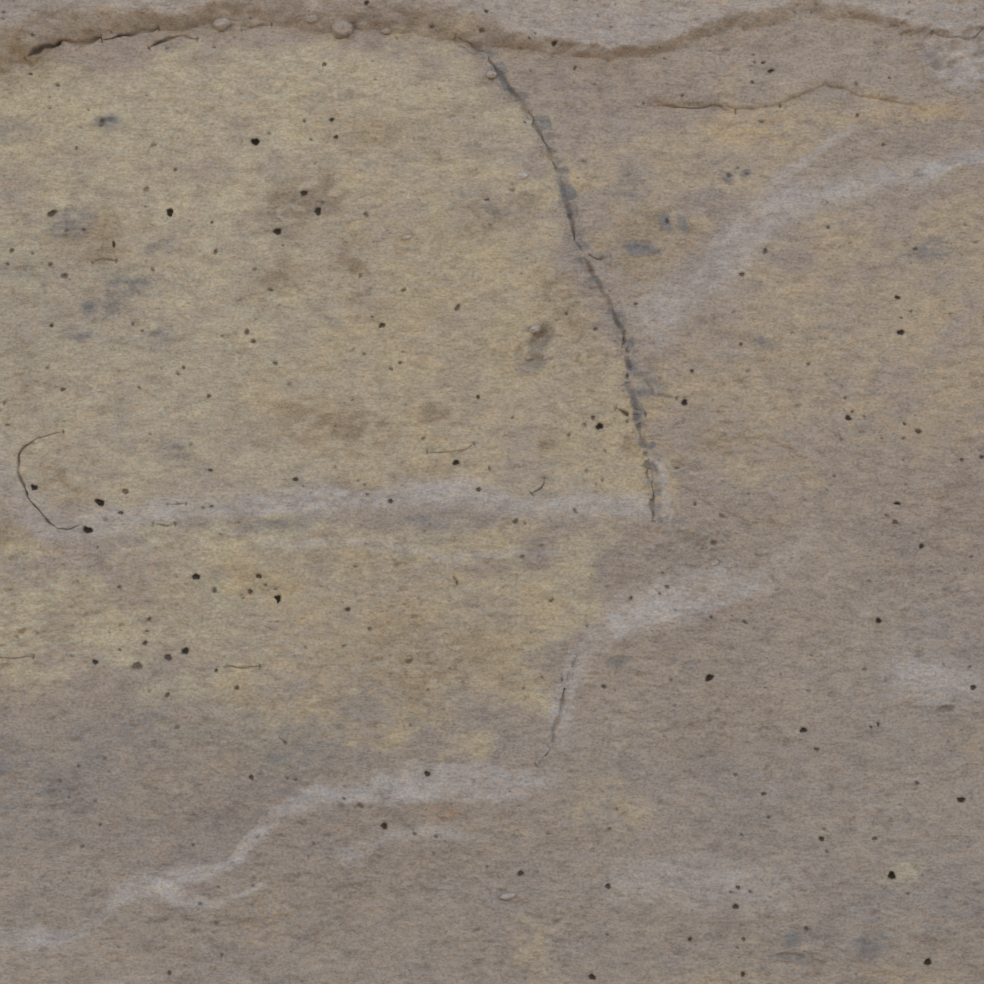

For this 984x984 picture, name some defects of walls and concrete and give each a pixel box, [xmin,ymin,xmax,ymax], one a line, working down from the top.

crack [644,100,735,116]
crack [455,29,677,529]
crack [13,429,82,533]